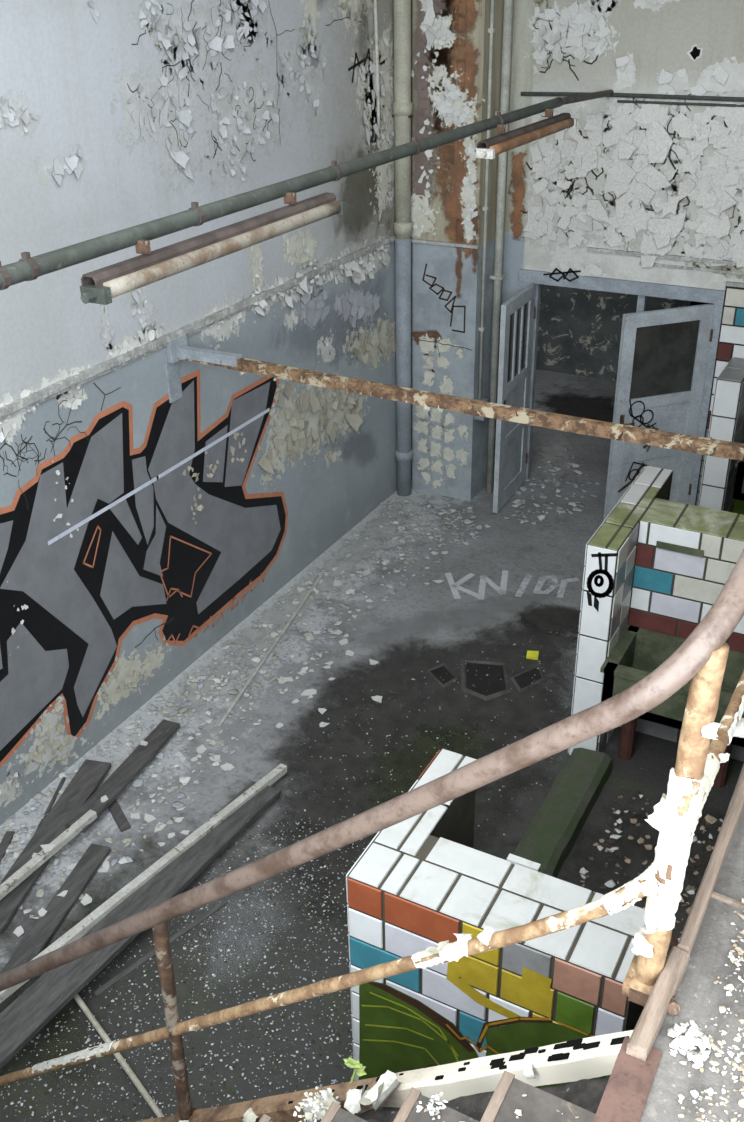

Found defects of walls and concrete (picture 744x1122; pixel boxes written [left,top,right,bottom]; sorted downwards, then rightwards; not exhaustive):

peeling [0,89,42,138]
peeling [35,143,87,187]
peeling [98,0,396,380]
peeling [411,0,485,243]
corrosion [428,0,480,297]
peeling [521,0,744,283]
flaking render [419,333,465,396]
crack [0,383,121,508]
peeling [182,376,371,524]
flaking render [414,405,469,489]
damp [274,606,581,851]
damp [304,832,378,919]